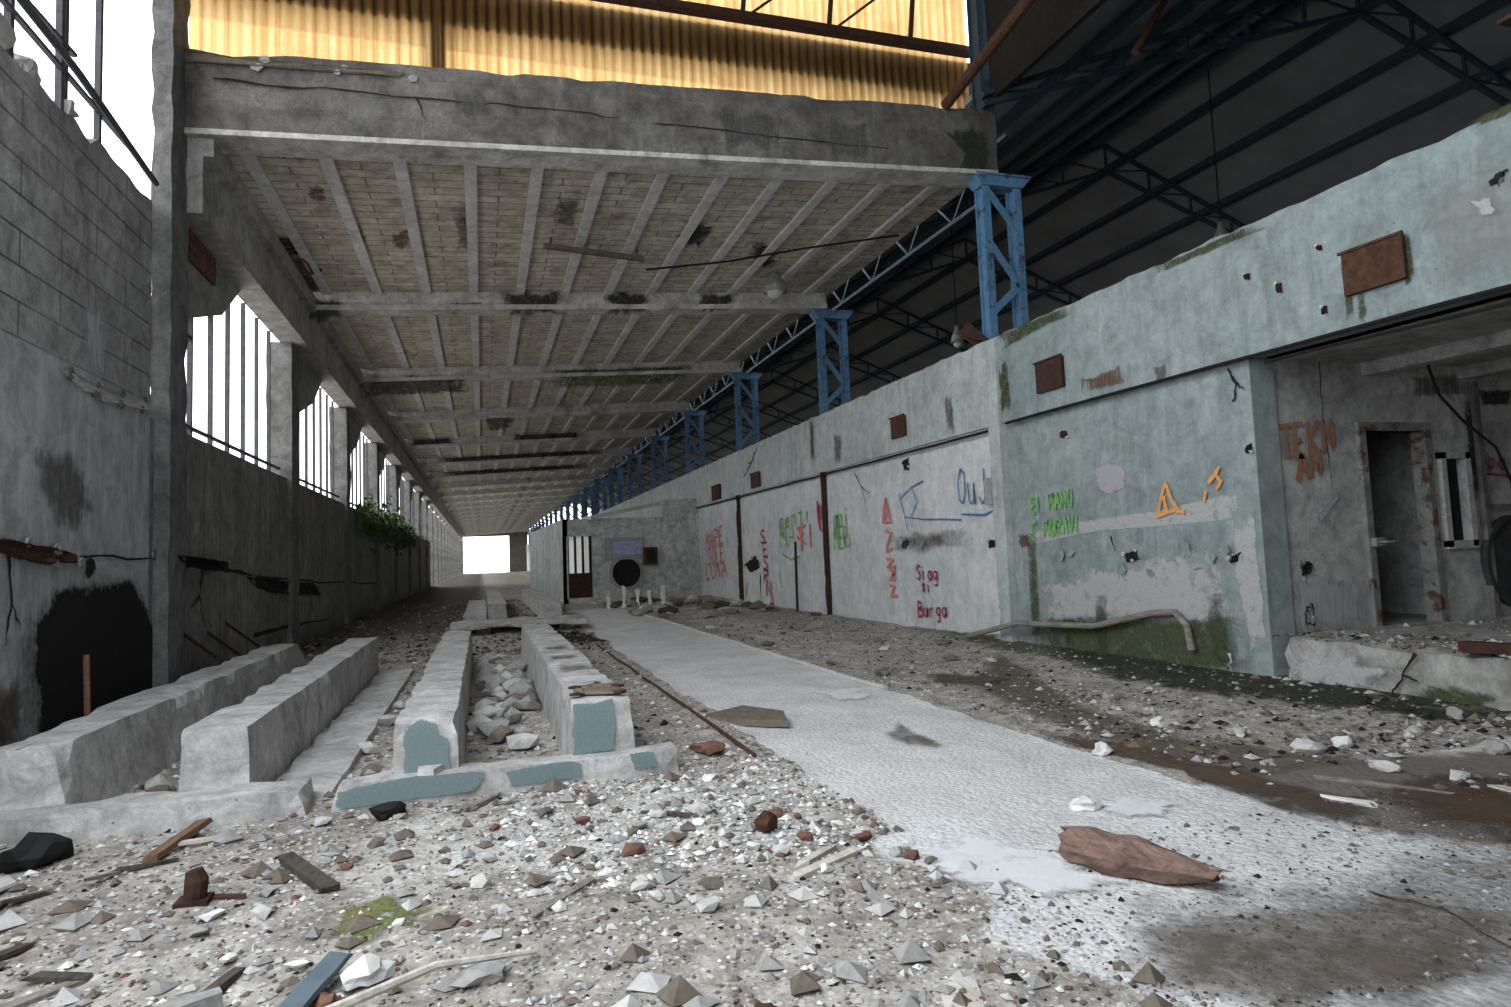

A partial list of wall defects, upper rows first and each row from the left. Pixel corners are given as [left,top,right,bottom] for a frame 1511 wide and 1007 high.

crack [80,553,152,561]
crack [191,568,376,638]
water stain [1096,601,1107,649]
peeling [1021,494,1267,651]
water stain [1208,595,1226,665]